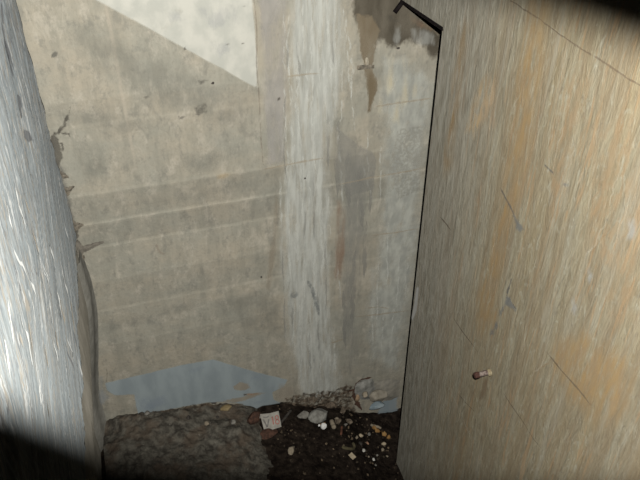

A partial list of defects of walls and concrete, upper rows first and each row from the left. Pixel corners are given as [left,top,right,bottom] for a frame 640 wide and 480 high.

damp [286,0,340,398]